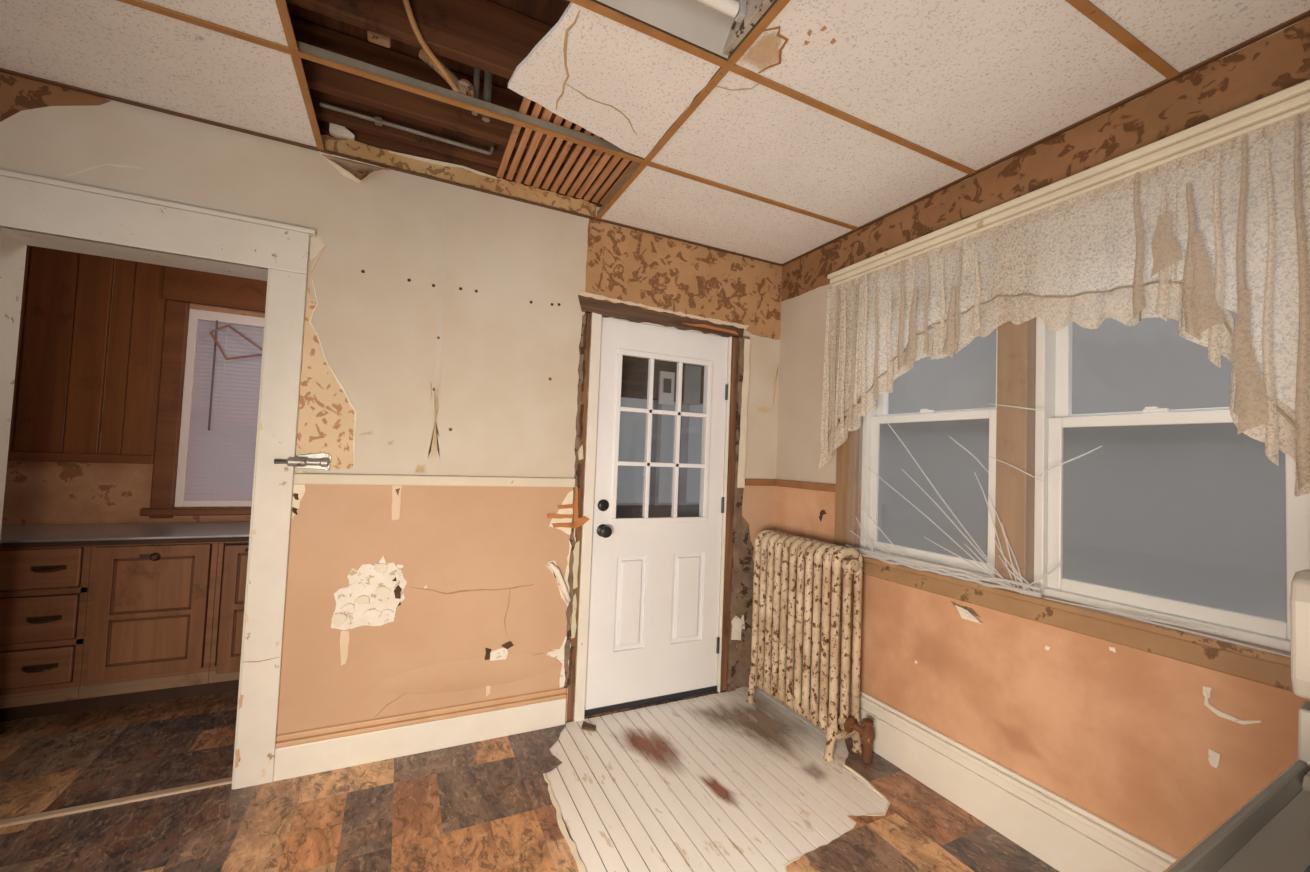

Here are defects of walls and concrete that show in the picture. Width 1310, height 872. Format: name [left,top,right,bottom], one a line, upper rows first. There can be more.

leakage [716,26,836,91]
peeling [319,151,391,183]
flaking render [545,313,589,688]
flaking render [331,556,407,665]
spalling [485,641,513,661]
peeling [1203,686,1262,724]
peeling [1208,748,1221,768]